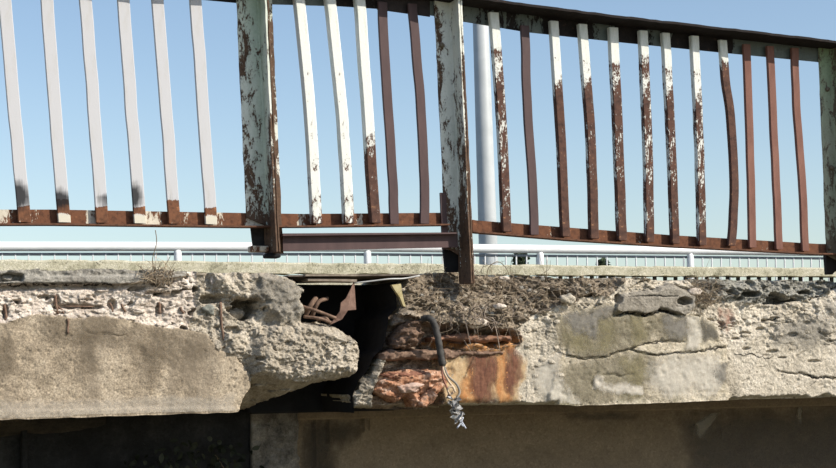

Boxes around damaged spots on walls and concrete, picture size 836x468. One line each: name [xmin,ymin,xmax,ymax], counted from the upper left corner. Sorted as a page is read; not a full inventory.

spalling [0,271,694,410]
corrosion [372,318,526,407]
crack [557,340,773,362]
spalling [687,289,836,400]
crack [785,372,836,385]